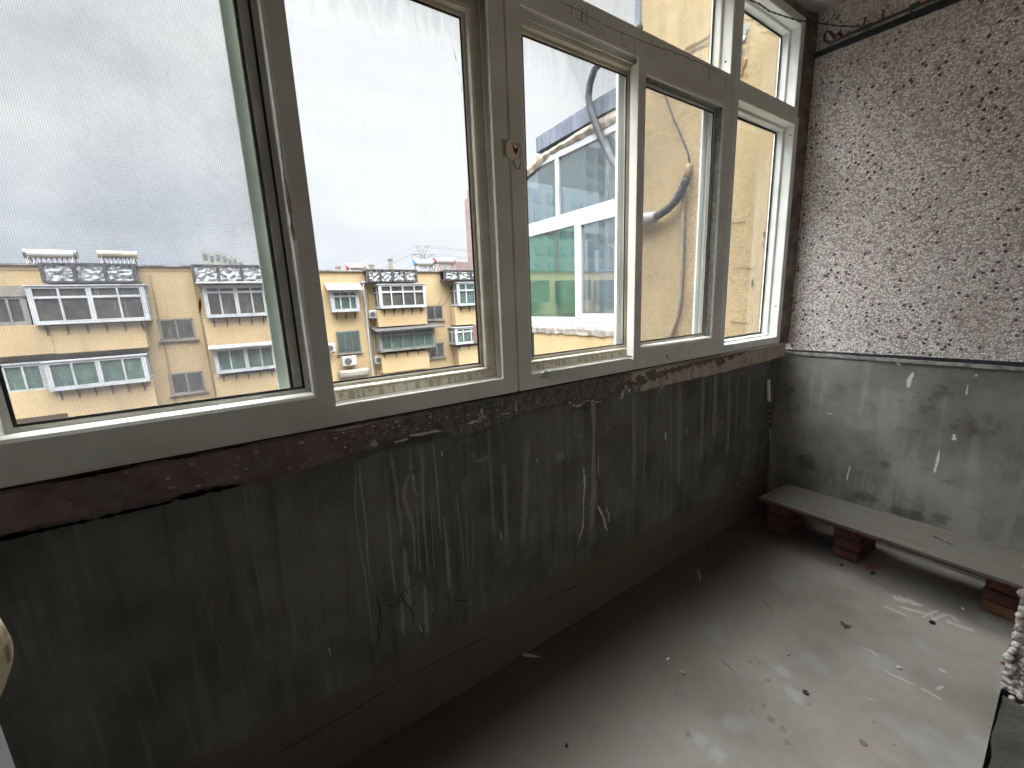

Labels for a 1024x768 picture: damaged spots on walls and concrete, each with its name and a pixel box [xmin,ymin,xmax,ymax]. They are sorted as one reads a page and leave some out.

peeling [617,350,759,399]
peeling [299,391,552,455]
peeling [86,475,140,512]
crack [0,485,240,541]
damp [381,441,474,643]
damp [486,429,532,556]